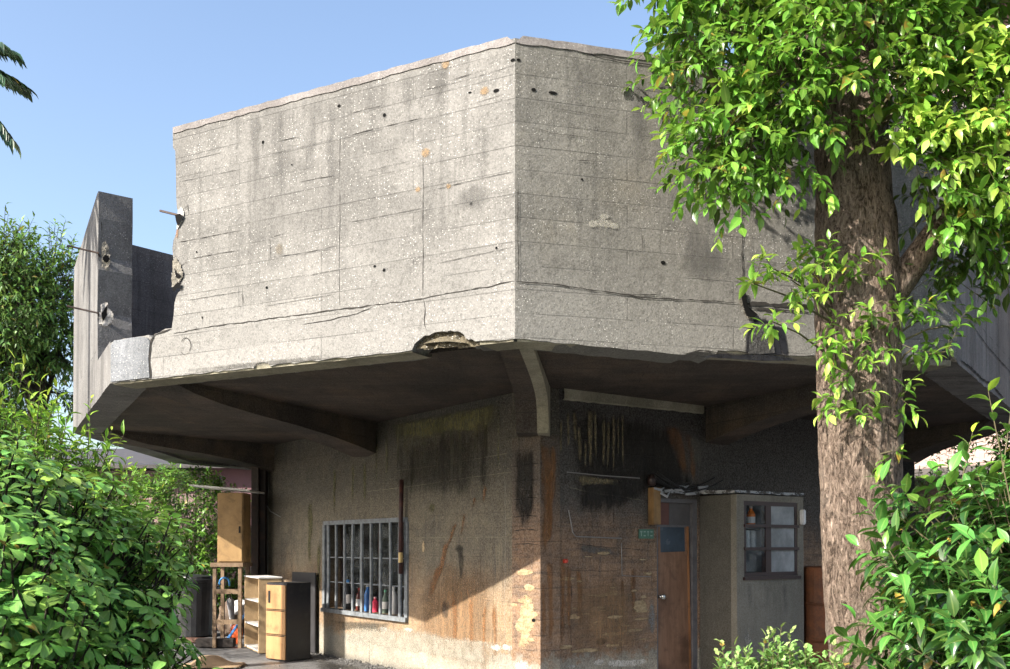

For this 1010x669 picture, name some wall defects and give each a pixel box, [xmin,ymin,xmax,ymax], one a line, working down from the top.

spalling [159,207,189,237]
spalling [67,241,110,270]
crack [149,105,813,379]
spalling [171,257,183,291]
spalling [66,302,113,326]
spalling [416,332,480,350]
damp [560,413,623,485]
peeling [511,569,538,649]
rust [543,565,553,636]